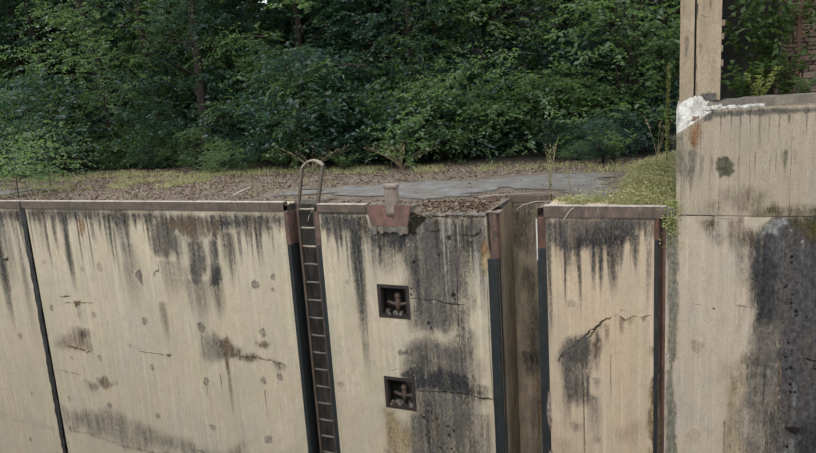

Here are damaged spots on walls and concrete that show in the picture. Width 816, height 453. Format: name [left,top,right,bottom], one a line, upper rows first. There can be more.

spalling [676,95,723,134]
leakage [0,209,282,306]
leakage [546,217,654,318]
leakage [321,212,486,453]
crack [410,281,463,366]
crack [419,272,494,402]
crack [558,309,650,361]
leakage [730,215,816,453]
leakage [559,336,599,451]